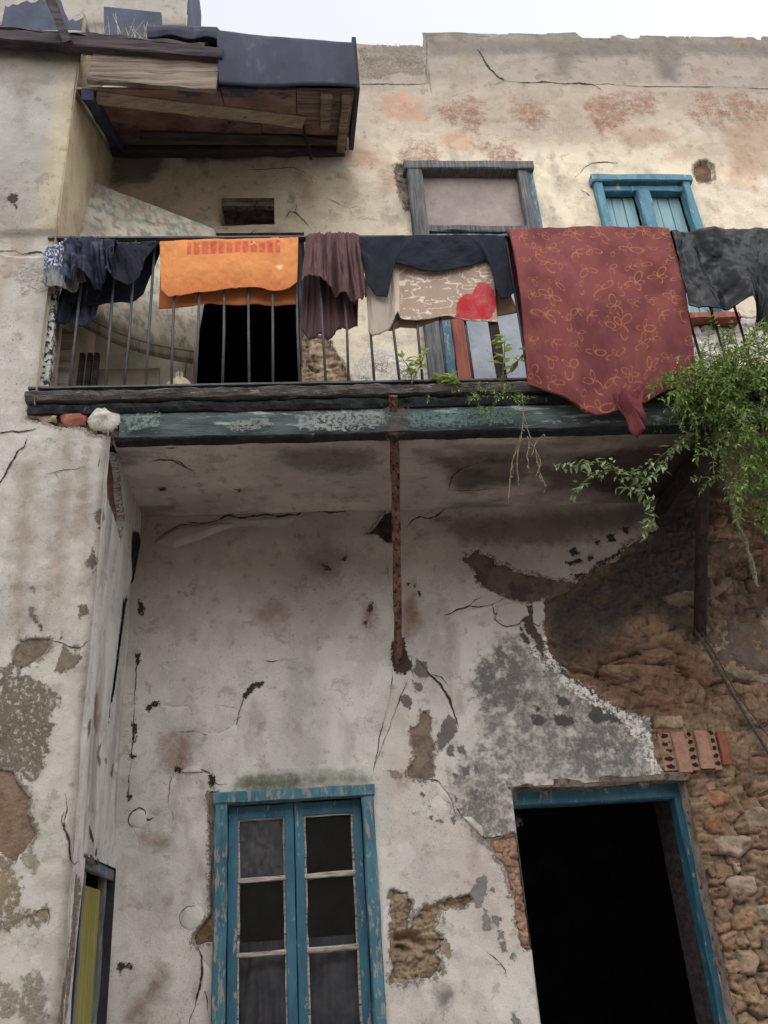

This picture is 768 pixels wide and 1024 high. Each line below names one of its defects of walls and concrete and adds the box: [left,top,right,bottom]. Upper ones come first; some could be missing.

crack [478,50,729,90]
spalling [691,158,719,184]
crack [0,426,40,483]
crack [188,511,345,530]
crack [407,461,506,527]
peeling [0,606,82,937]
crack [127,649,298,849]
crack [373,654,459,772]
spalling [387,638,480,824]
damp [455,637,653,840]
spalling [459,498,768,1024]
spalling [386,830,530,990]